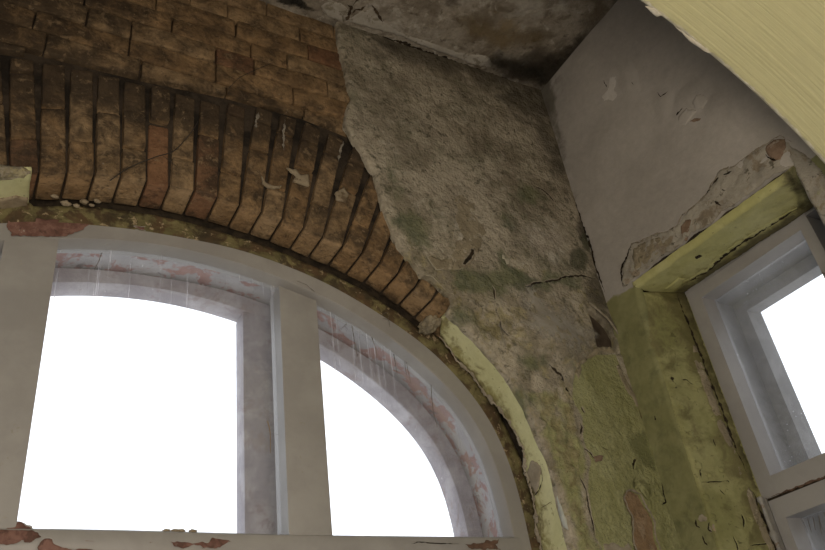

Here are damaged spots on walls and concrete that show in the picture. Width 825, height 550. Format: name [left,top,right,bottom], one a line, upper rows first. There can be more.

crack [346,0,383,22]
peeling [321,2,492,67]
water stain [491,51,571,83]
water stain [286,168,309,187]
water stain [334,187,349,203]
spalling [620,135,793,287]
peeling [6,218,89,237]
crack [526,199,604,289]
water stain [571,235,589,269]
spalling [439,336,568,550]
peeling [0,521,94,550]
peeling [170,537,231,549]